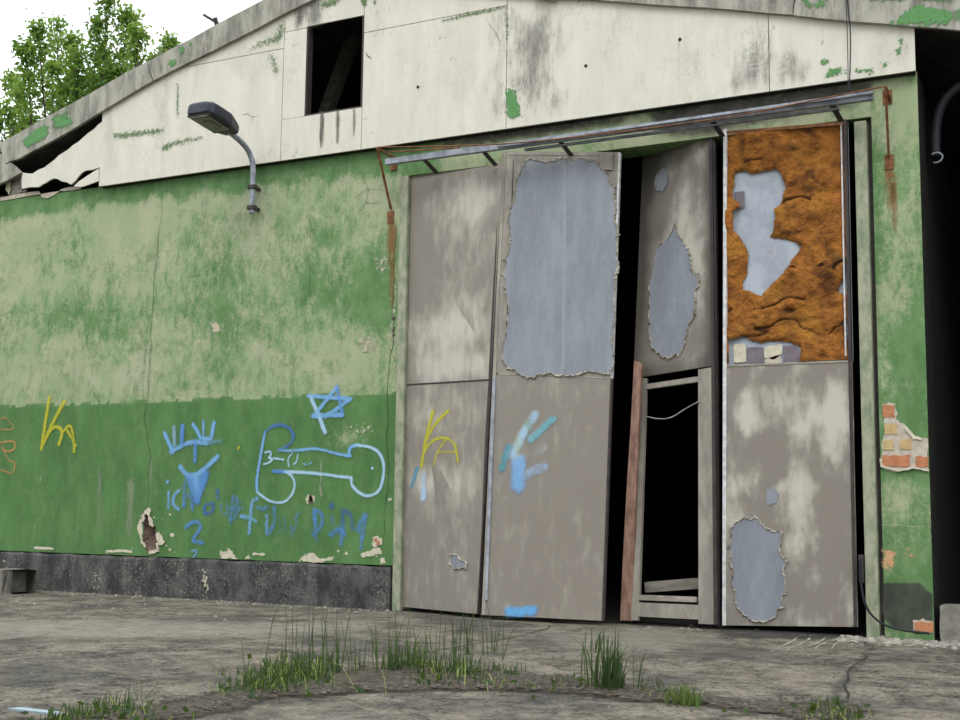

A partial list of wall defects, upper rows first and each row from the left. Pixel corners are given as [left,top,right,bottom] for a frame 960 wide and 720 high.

peeling [503,159,617,377]
peeling [649,226,698,358]
spalling [879,402,929,472]
spalling [106,508,175,557]
flaking render [220,548,265,560]
flaking render [299,550,348,563]
flaking render [360,536,386,564]
peeling [730,518,785,621]
crack [835,647,873,720]